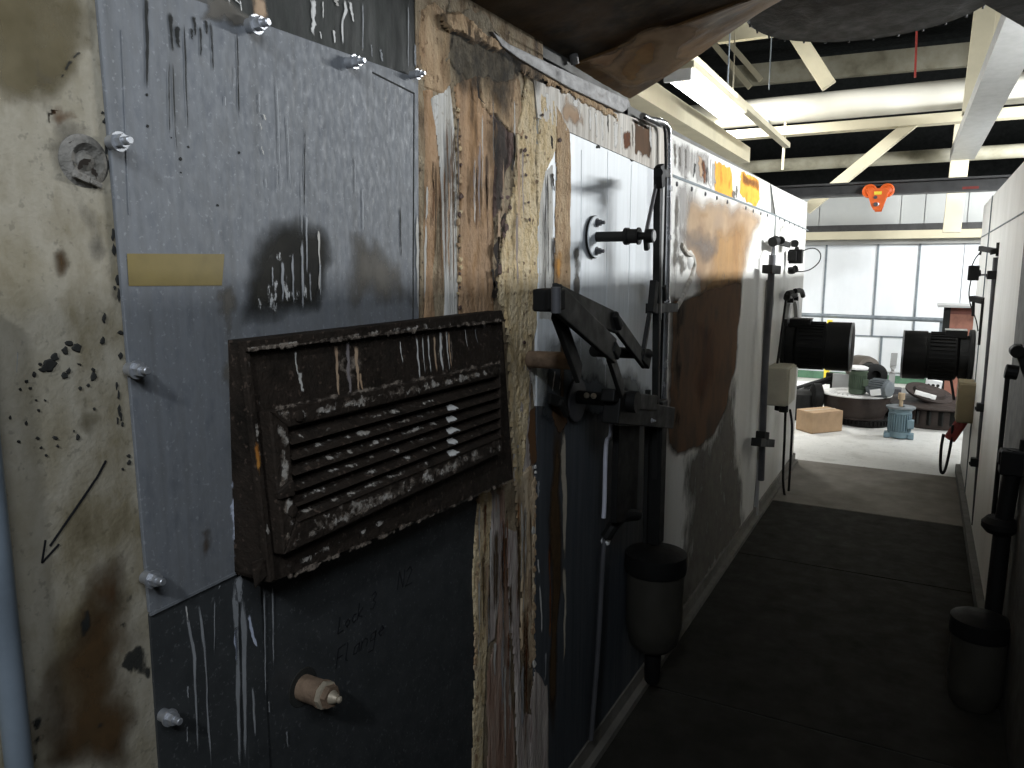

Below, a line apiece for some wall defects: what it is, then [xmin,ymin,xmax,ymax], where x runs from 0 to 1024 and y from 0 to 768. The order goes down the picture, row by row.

peeling [419,2,506,93]
leakage [272,146,321,305]
peeling [18,341,97,412]
peeling [248,341,312,351]
peeling [276,76,571,768]